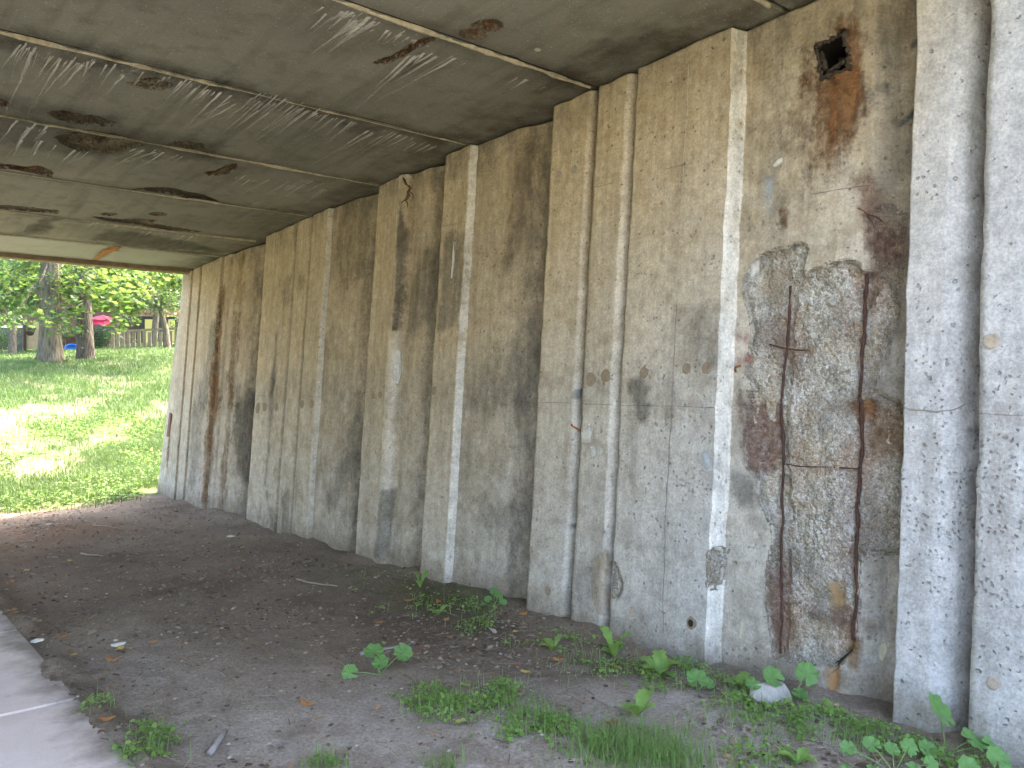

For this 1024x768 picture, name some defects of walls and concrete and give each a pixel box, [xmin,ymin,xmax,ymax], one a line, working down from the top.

damp [9,43,144,85]
spalling [47,110,146,153]
damp [157,77,435,151]
damp [317,7,465,78]
corrosion [817,24,863,153]
spalling [132,187,222,203]
crack [401,177,414,207]
corrosion [202,289,239,502]
damp [234,393,255,481]
corrosion [740,398,782,473]
spalling [742,241,904,669]
spalling [705,546,727,591]